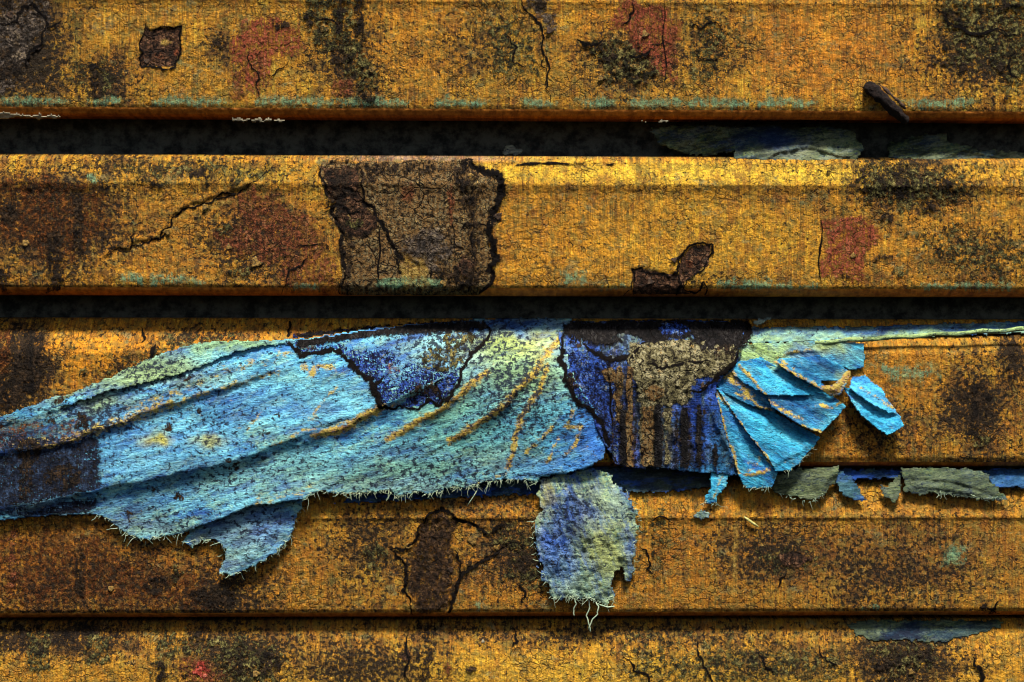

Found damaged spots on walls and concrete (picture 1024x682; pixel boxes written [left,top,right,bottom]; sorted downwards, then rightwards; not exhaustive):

spalling [138,22,182,71]
crack [467,0,554,102]
rust [611,0,681,82]
crack [106,168,268,258]
peeling [318,158,508,295]
peeling [623,242,715,296]
rust [818,215,908,284]
peeling [286,319,492,410]
peeling [556,333,630,463]
peeling [363,506,526,627]